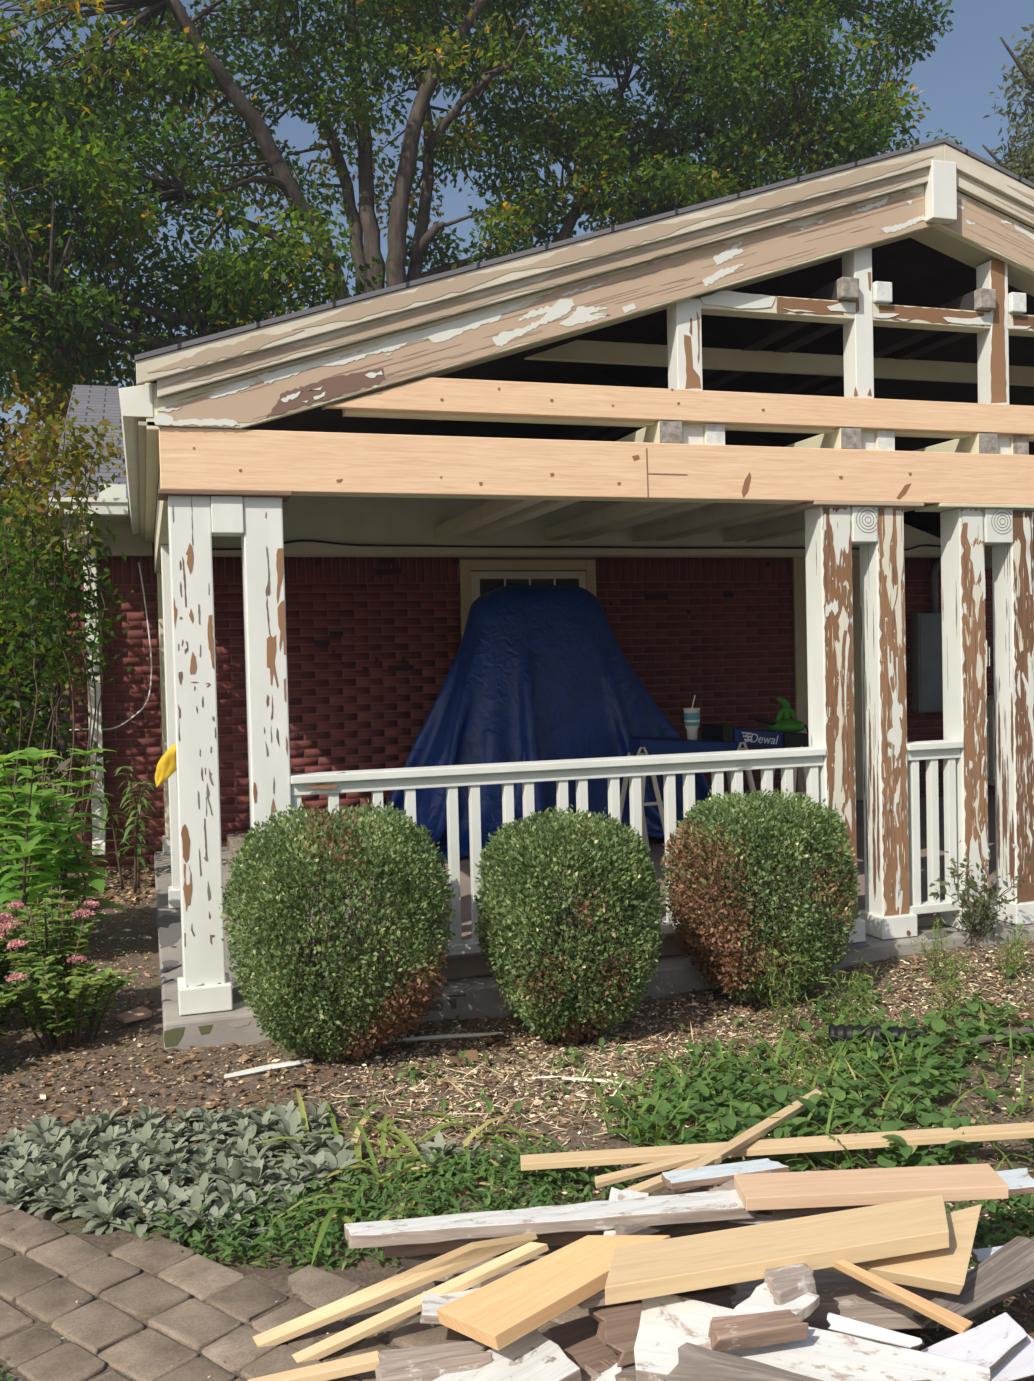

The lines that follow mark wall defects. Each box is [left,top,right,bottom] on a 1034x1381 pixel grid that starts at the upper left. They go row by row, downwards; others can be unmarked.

peeling [147,156,1034,427]
peeling [173,601,214,674]
peeling [267,548,286,701]
peeling [822,506,909,920]
peeling [960,508,1034,908]
peeling [181,824,192,909]
peeling [253,782,276,813]